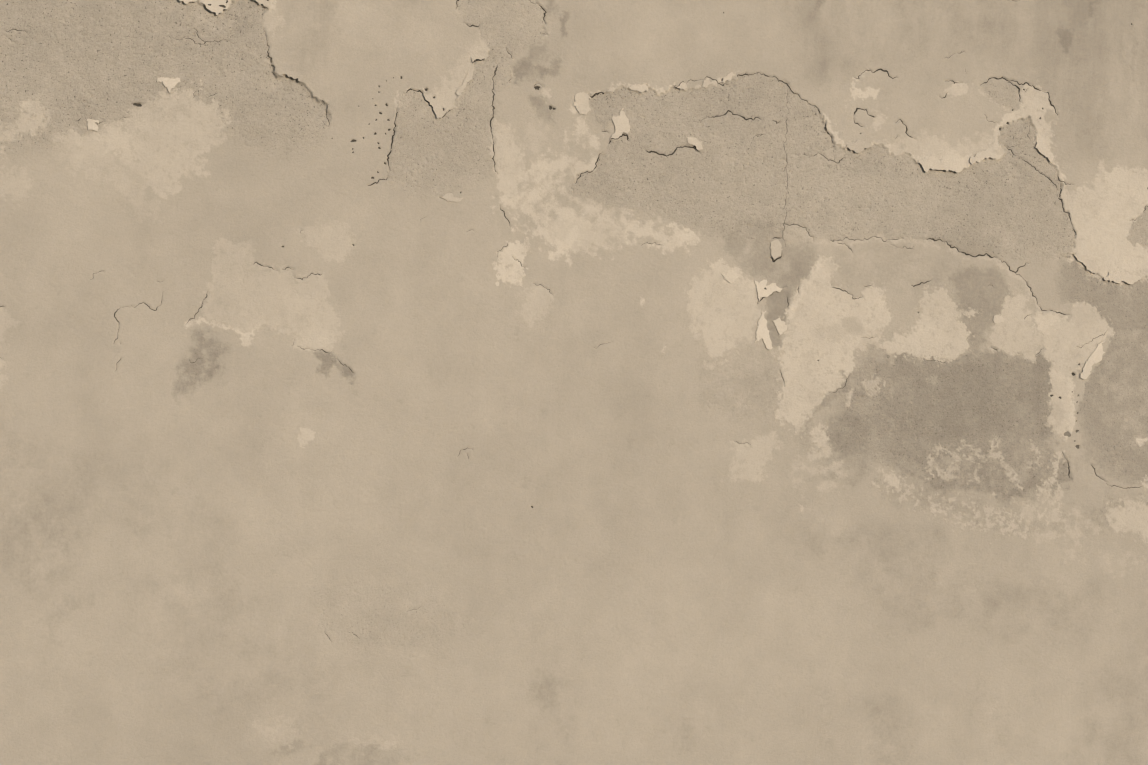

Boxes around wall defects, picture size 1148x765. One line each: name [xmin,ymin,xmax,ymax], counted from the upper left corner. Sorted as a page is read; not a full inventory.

crack [114,281,163,370]
spalling [0,0,333,233]
spalling [351,0,1148,590]
leakage [690,209,1148,765]